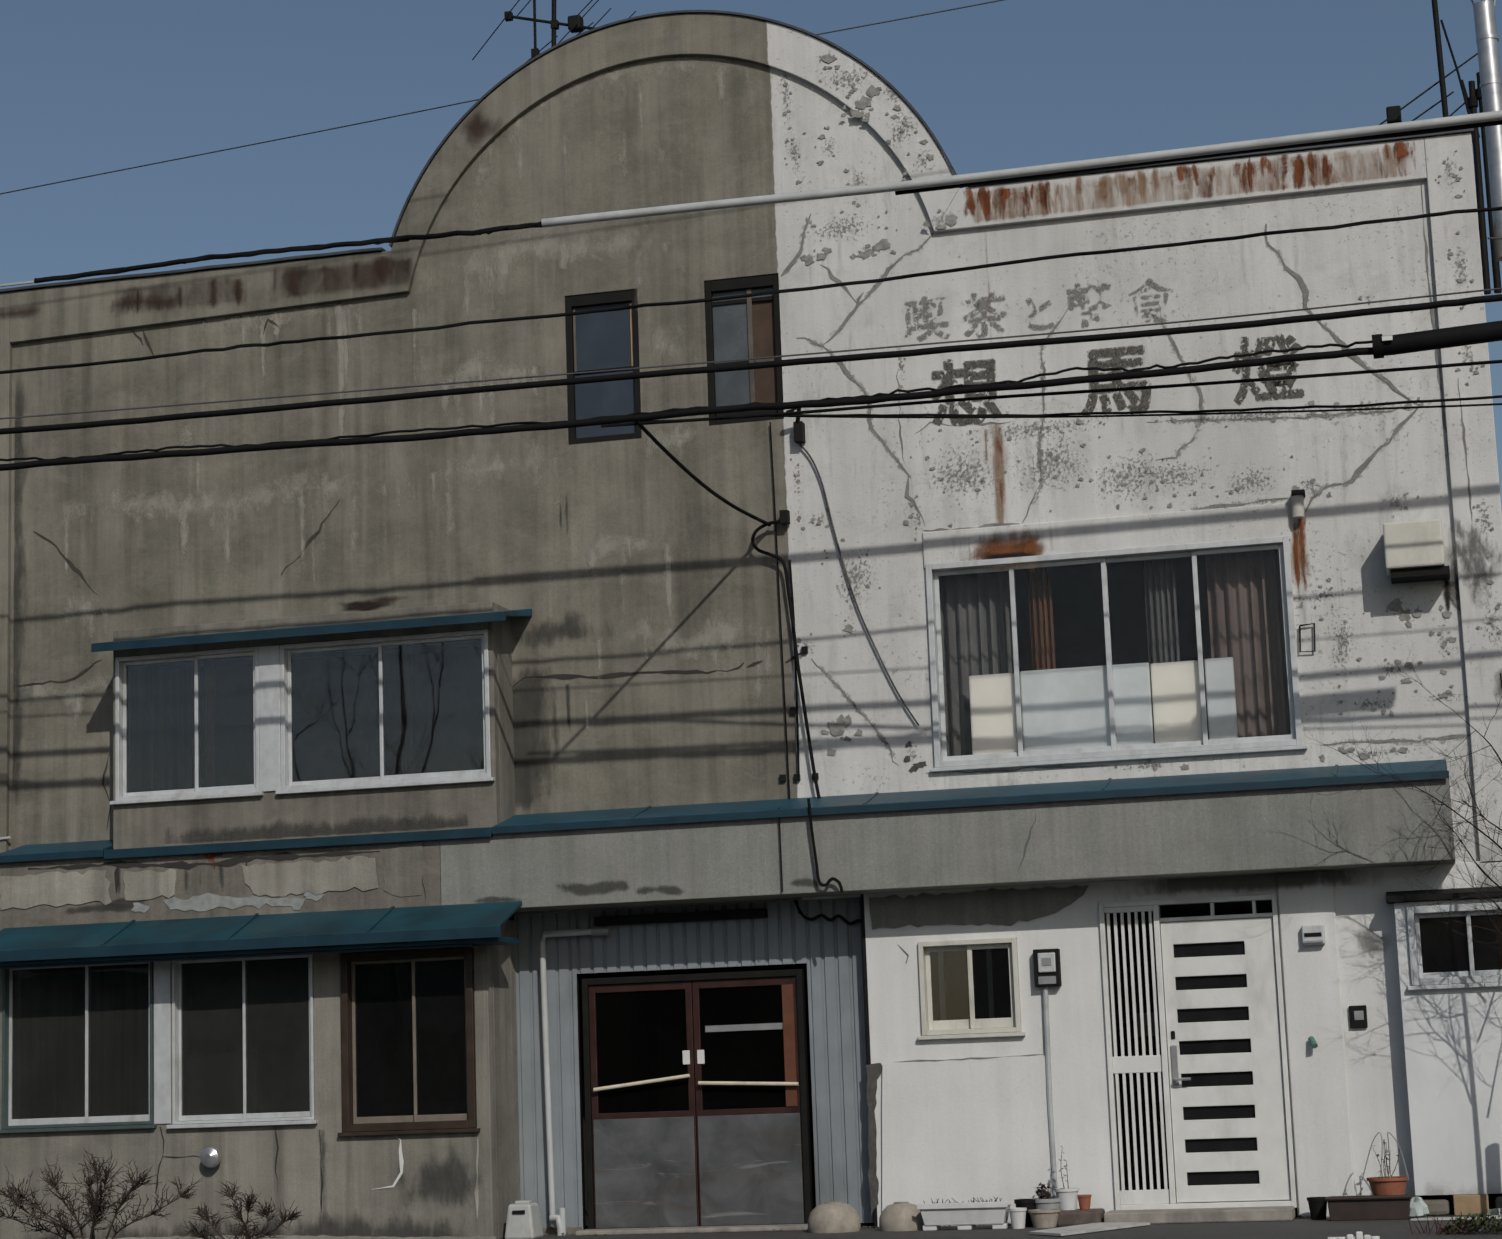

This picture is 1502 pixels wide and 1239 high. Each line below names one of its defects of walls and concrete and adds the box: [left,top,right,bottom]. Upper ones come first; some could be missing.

peeling [780,51,936,265]
peeling [923,209,958,229]
corrosion [965,181,1048,220]
corrosion [1235,153,1333,193]
corrosion [1386,141,1413,162]
crack [781,214,1068,532]
crack [1151,183,1472,517]
corrosion [976,427,1039,560]
corrosion [1293,518,1306,590]
crack [513,652,1108,773]
crack [1323,734,1469,745]
flaking render [0,842,424,913]